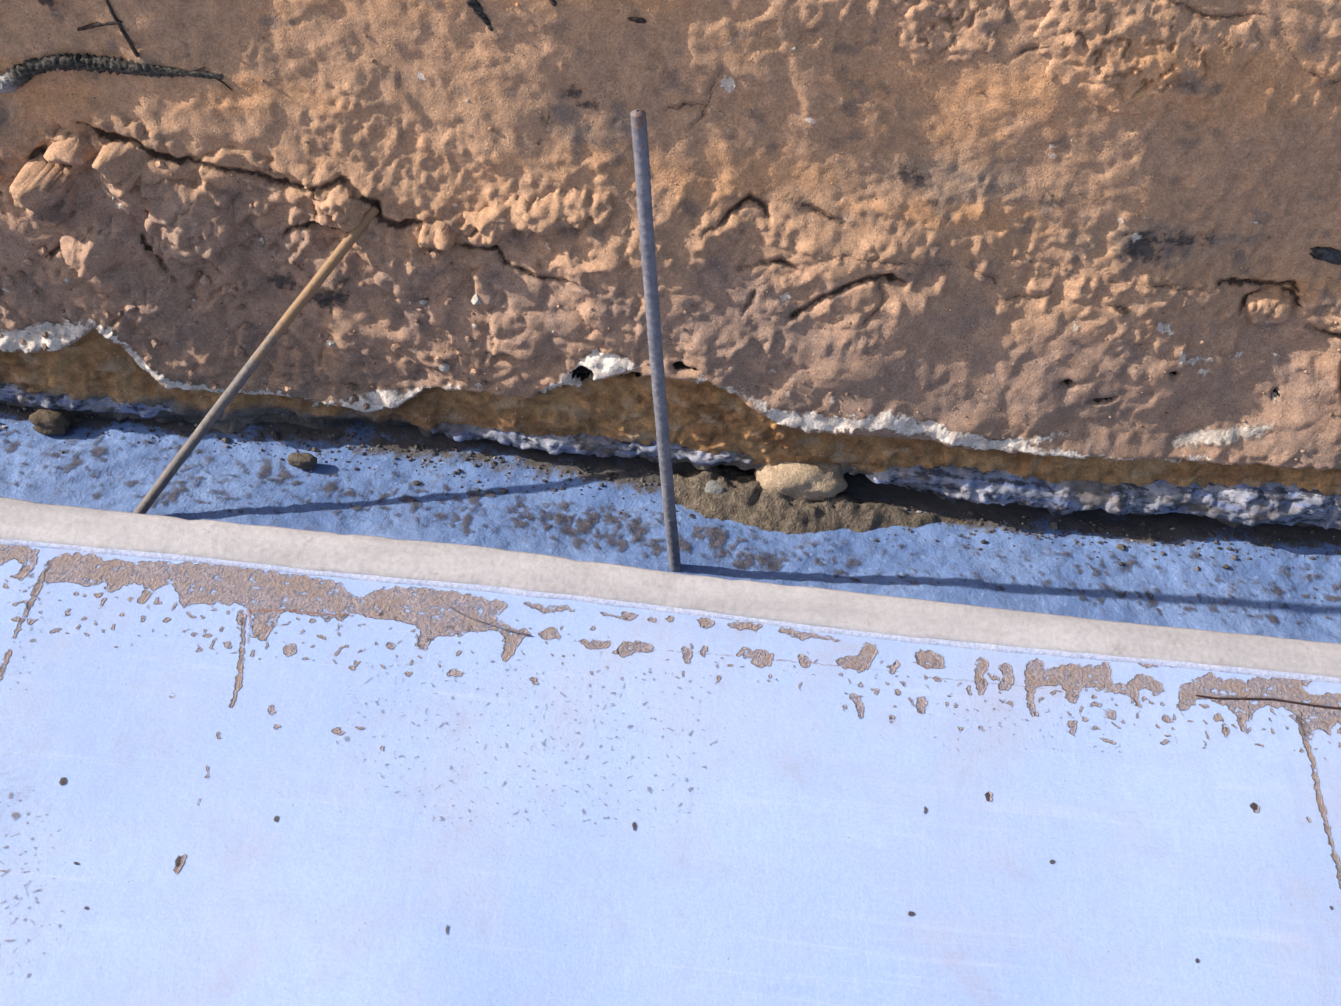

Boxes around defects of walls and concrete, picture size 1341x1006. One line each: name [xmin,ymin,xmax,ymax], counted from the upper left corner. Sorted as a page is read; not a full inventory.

crack [29,147,72,167]
crack [76,121,422,234]
crack [708,195,769,230]
crack [455,243,563,281]
crack [791,255,941,319]
spalling [126,439,865,582]
peeling [0,544,673,678]
peeling [697,617,762,631]
peeling [666,643,777,683]
peeling [778,627,839,689]
peeling [836,642,1341,759]
crack [1222,696,1341,889]